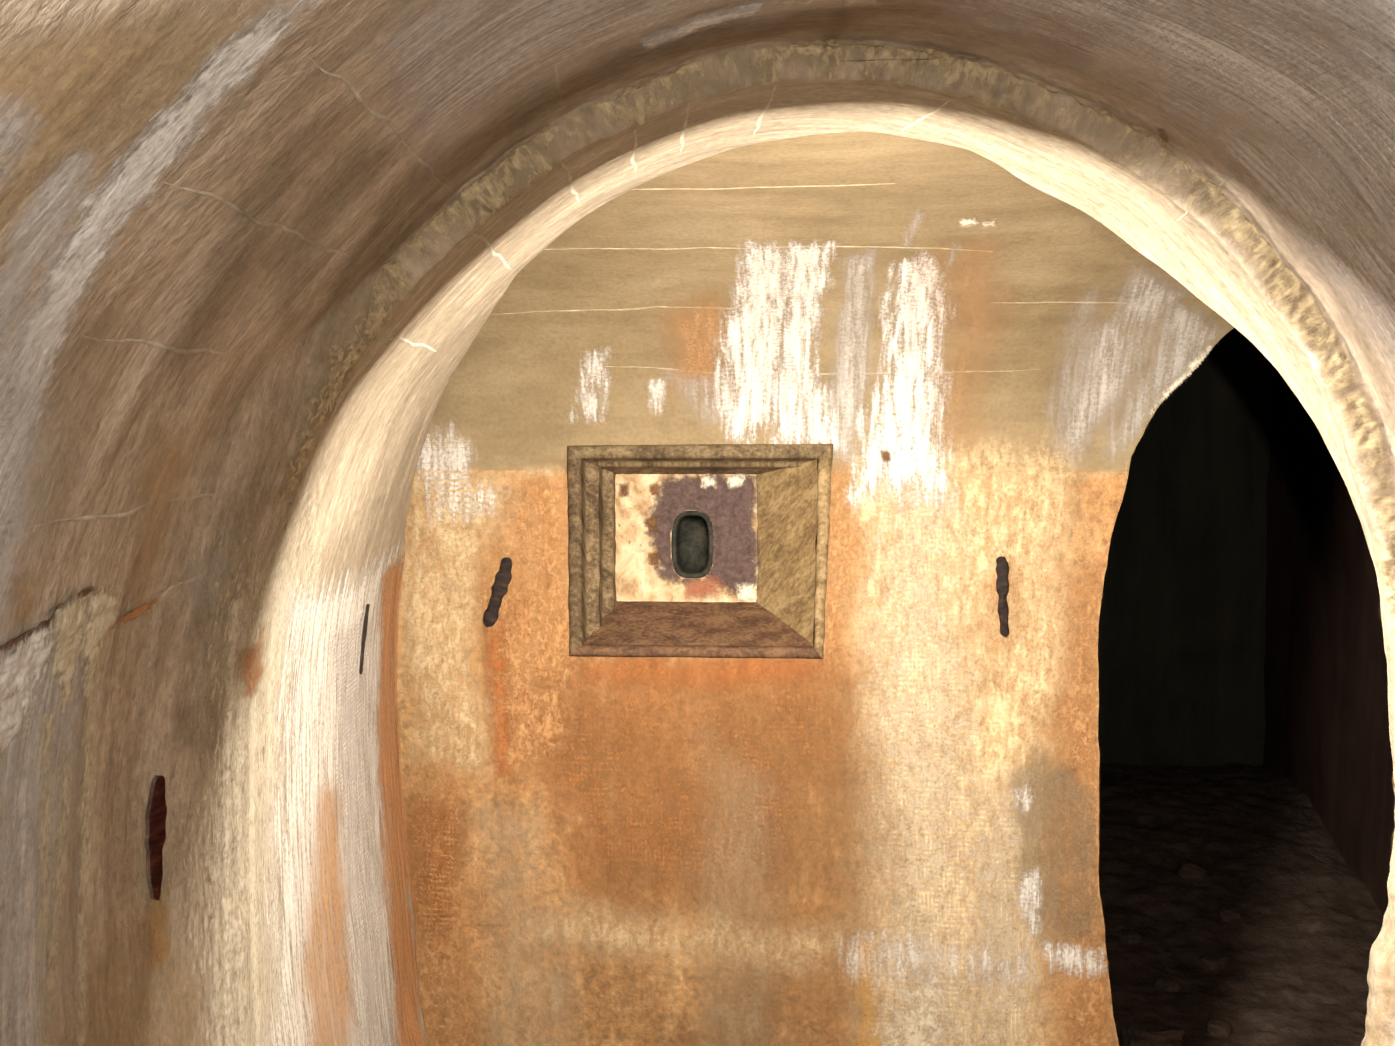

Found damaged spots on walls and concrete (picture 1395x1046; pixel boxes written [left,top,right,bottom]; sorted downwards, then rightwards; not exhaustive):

peeling [0,589,119,752]
spalling [275,51,736,502]
corrosion [480,475,576,773]
damp [332,0,775,314]
damp [570,351,609,421]
peeling [702,475,745,487]
peeling [737,585,756,600]
damp [715,241,1107,1046]
spalling [753,38,1395,649]
damp [1067,276,1214,451]
damp [981,0,1395,333]
corrosion [144,775,167,900]